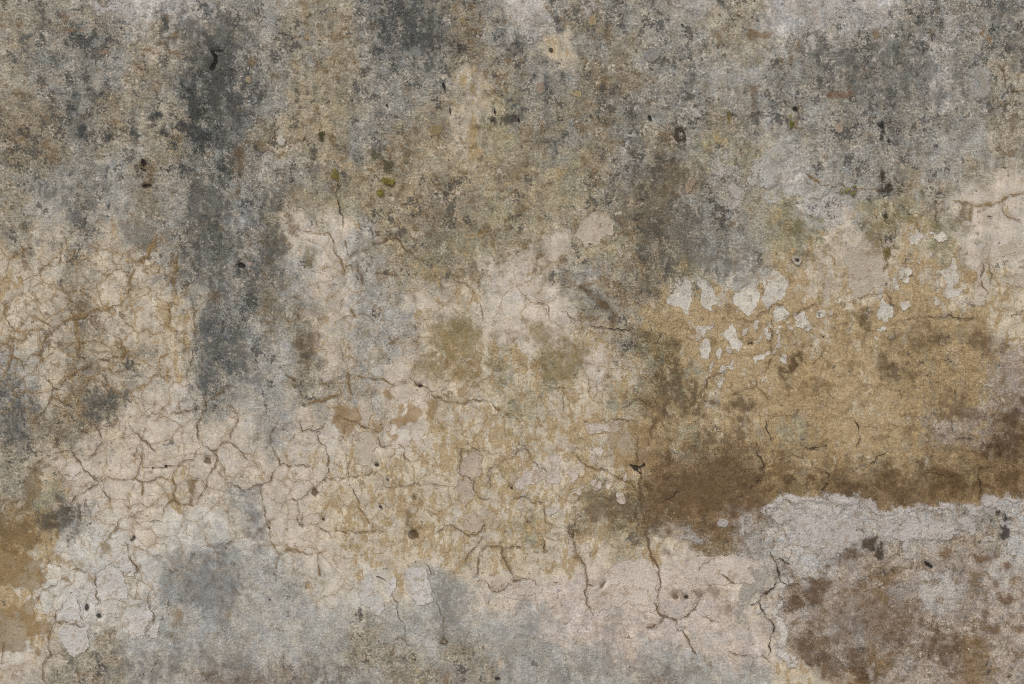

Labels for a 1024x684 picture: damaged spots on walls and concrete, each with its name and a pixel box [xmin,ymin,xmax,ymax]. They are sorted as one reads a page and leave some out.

leakage [149,69,218,150]
crack [302,166,424,283]
peeling [666,269,826,388]
leakage [711,133,831,210]
peeling [863,225,948,347]
peeling [933,225,1024,313]
crack [0,237,594,683]
crack [575,398,715,655]
leakage [655,337,755,464]
crack [698,302,829,499]
leakage [761,462,1022,573]
crack [729,552,798,676]